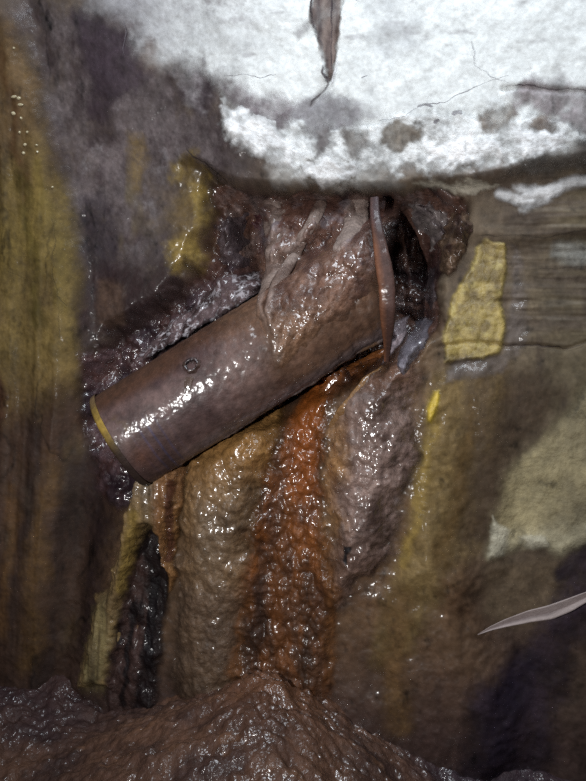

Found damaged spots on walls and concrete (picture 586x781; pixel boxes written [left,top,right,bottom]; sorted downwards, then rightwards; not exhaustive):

spalling [309,0,341,106]
crack [379,41,557,124]
water stain [222,96,586,186]
water stain [422,175,586,207]
water stain [553,244,586,264]
water stain [0,0,264,689]
rust [229,349,384,701]
water stain [379,239,549,731]
water stain [486,546,586,620]
water stain [461,603,586,781]